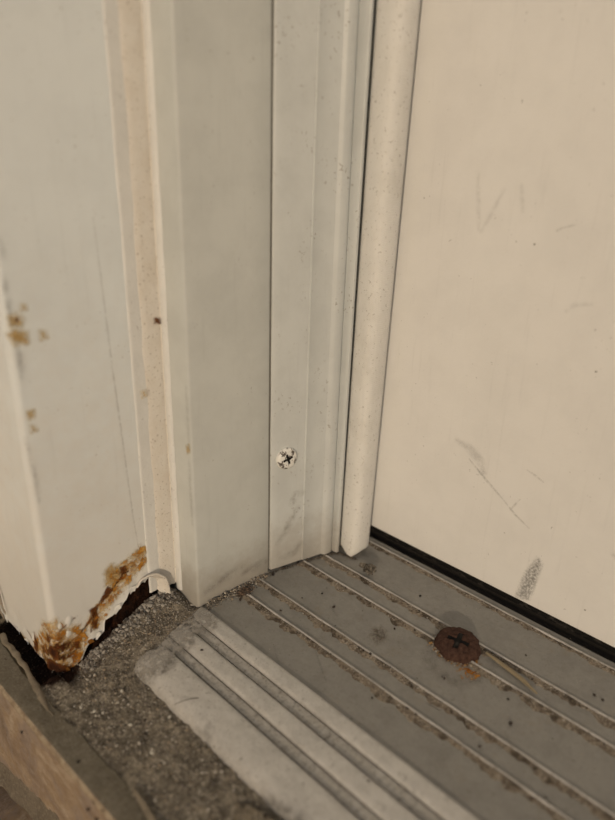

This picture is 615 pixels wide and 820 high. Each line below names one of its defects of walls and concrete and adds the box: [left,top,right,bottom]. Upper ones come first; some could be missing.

rust [9,316,28,344]
rust [0,546,154,686]